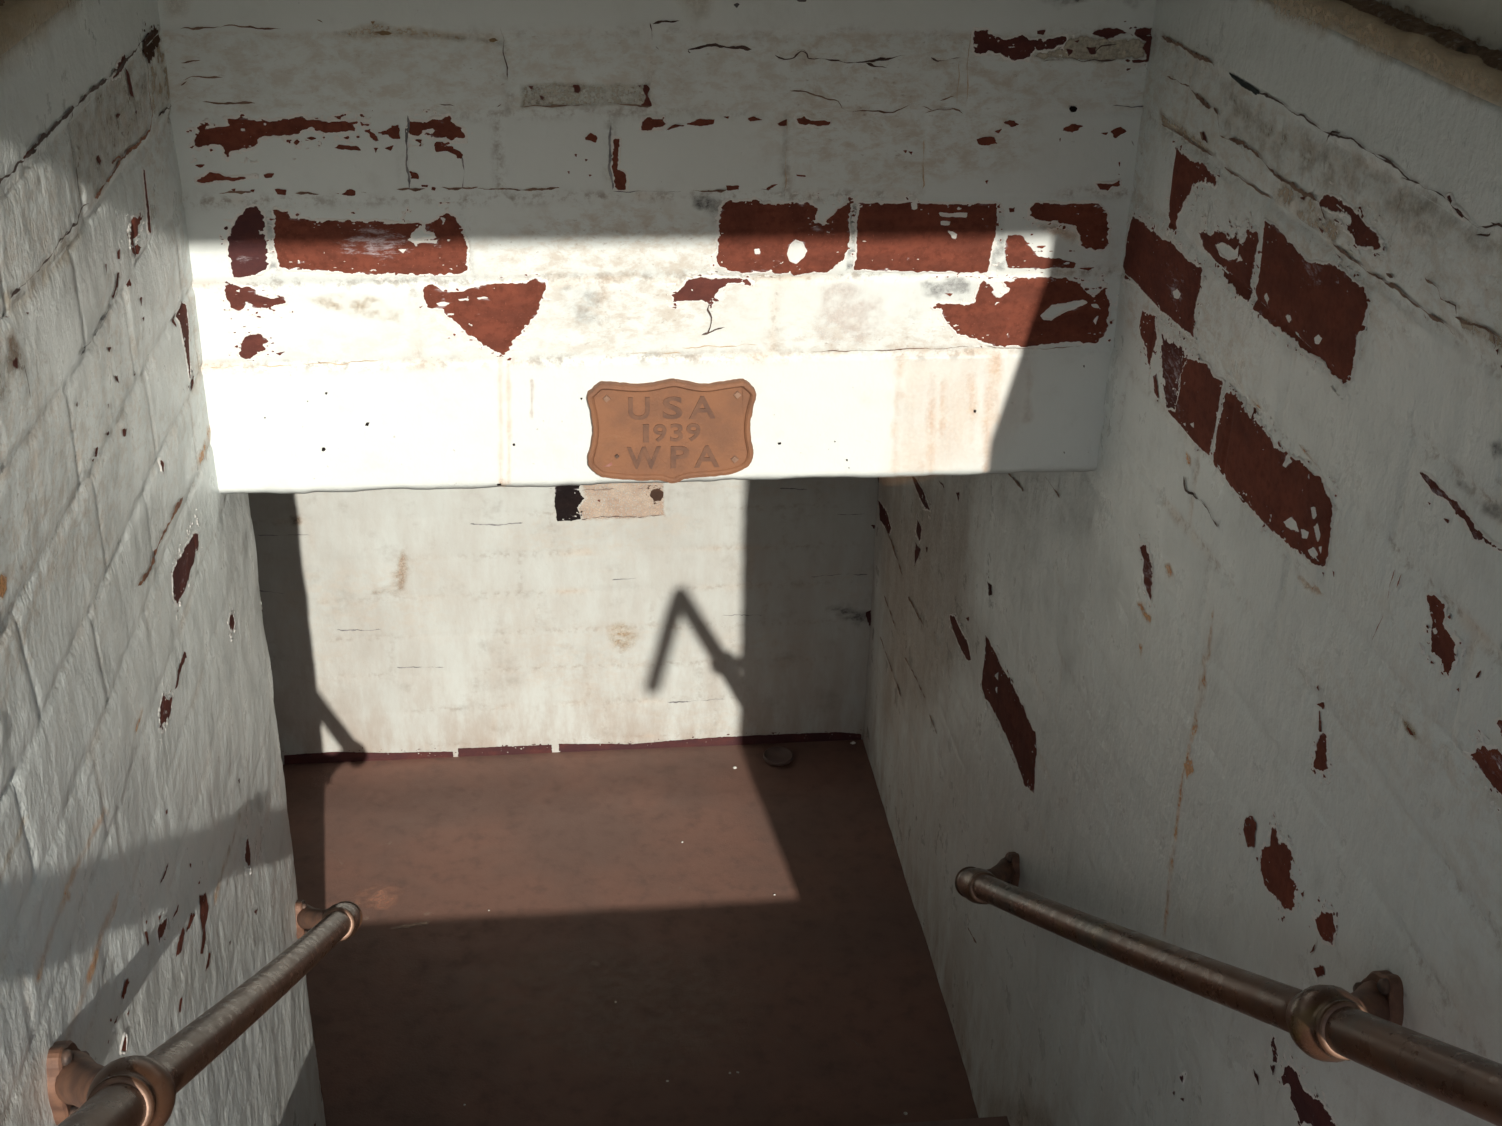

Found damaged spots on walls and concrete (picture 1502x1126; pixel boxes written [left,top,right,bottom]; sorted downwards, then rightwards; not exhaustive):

peeling [963,21,1152,71]
crack [0,24,278,299]
peeling [101,23,553,361]
crack [296,104,559,195]
crack [1114,36,1502,349]
peeling [666,114,1386,589]
peeling [170,509,203,620]
peeling [949,612,1038,794]
peeling [1419,591,1467,692]
peeling [1462,716,1502,820]
peeling [1243,810,1339,977]
peeling [1253,1034,1338,1126]